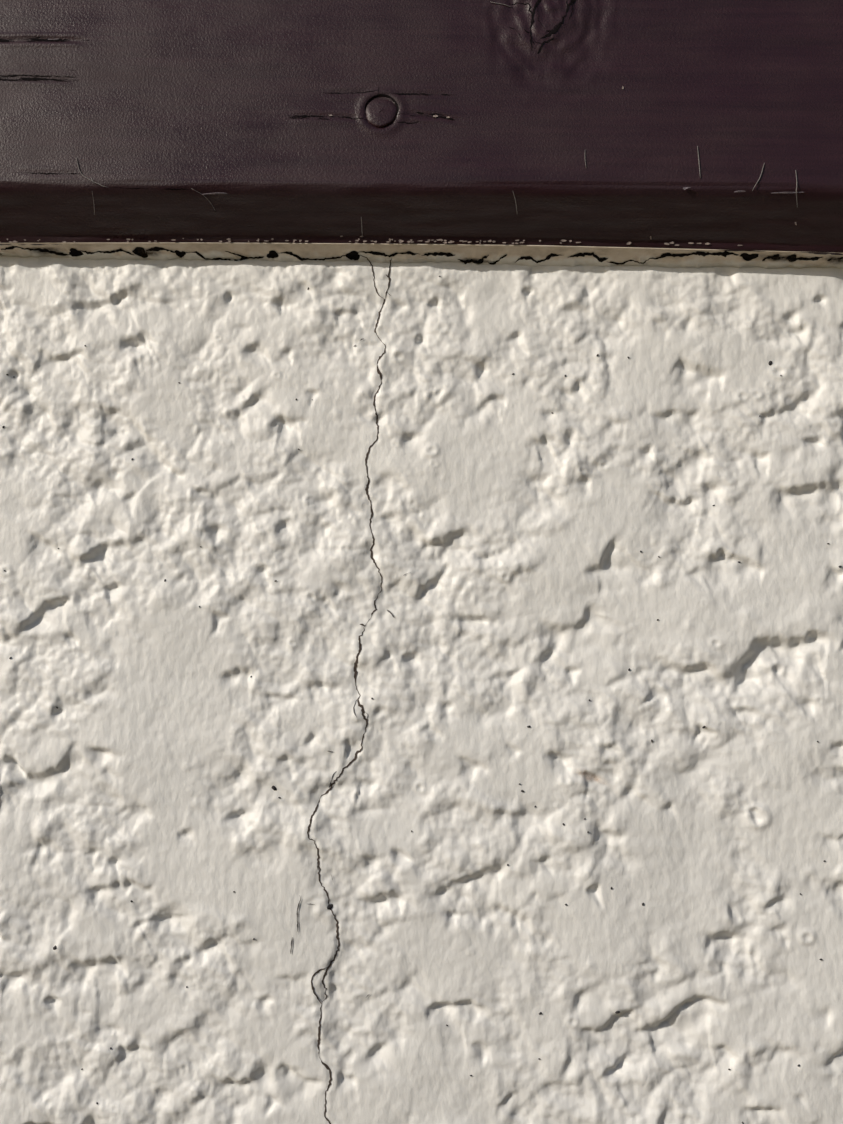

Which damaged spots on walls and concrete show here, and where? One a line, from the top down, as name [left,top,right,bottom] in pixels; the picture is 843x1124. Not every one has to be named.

crack [1,246,843,1124]